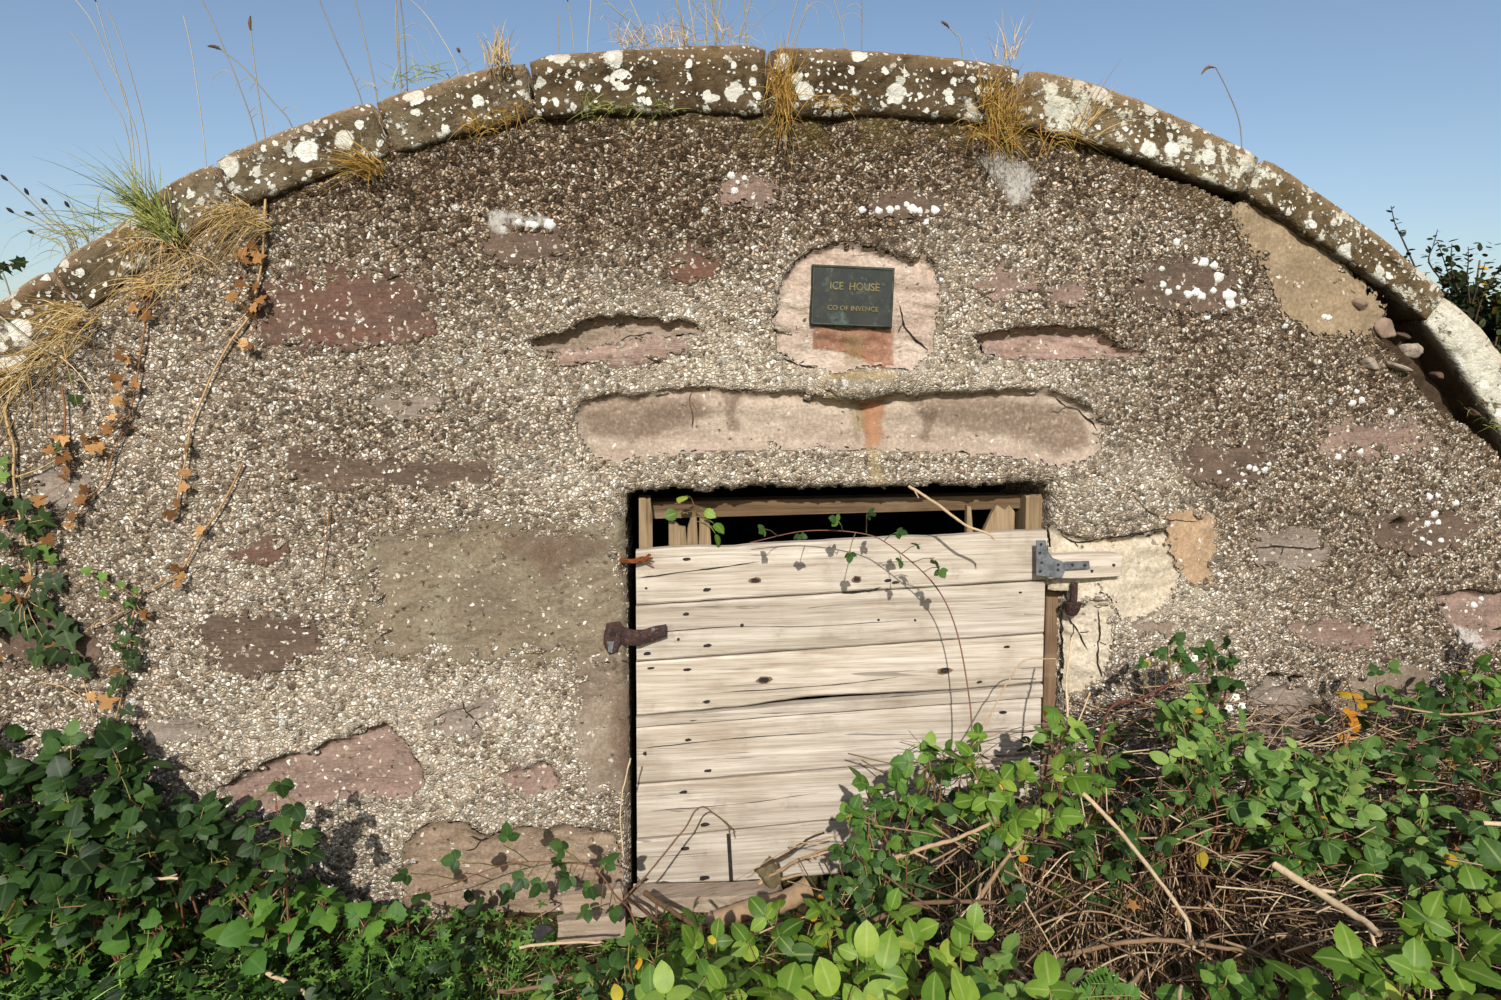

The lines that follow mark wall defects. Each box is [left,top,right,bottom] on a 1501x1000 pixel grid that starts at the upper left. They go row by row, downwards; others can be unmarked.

peeling [1125,200,1387,342]
spalling [1172,426,1278,490]
peeling [348,512,630,798]
peeling [1045,508,1220,693]